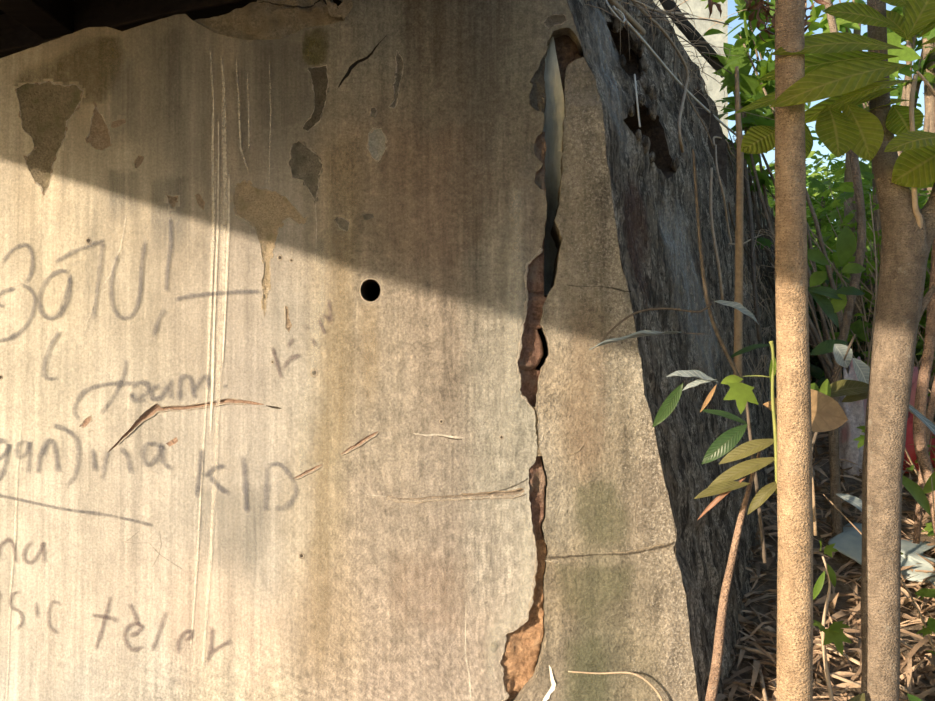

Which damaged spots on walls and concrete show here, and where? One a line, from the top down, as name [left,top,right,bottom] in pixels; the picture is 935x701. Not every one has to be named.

spalling [15,80,112,196]
spalling [288,65,330,203]
crack [338,36,386,87]
spalling [607,12,680,179]
flaking render [233,180,307,317]
crack [108,398,281,452]
crack [367,35,675,701]